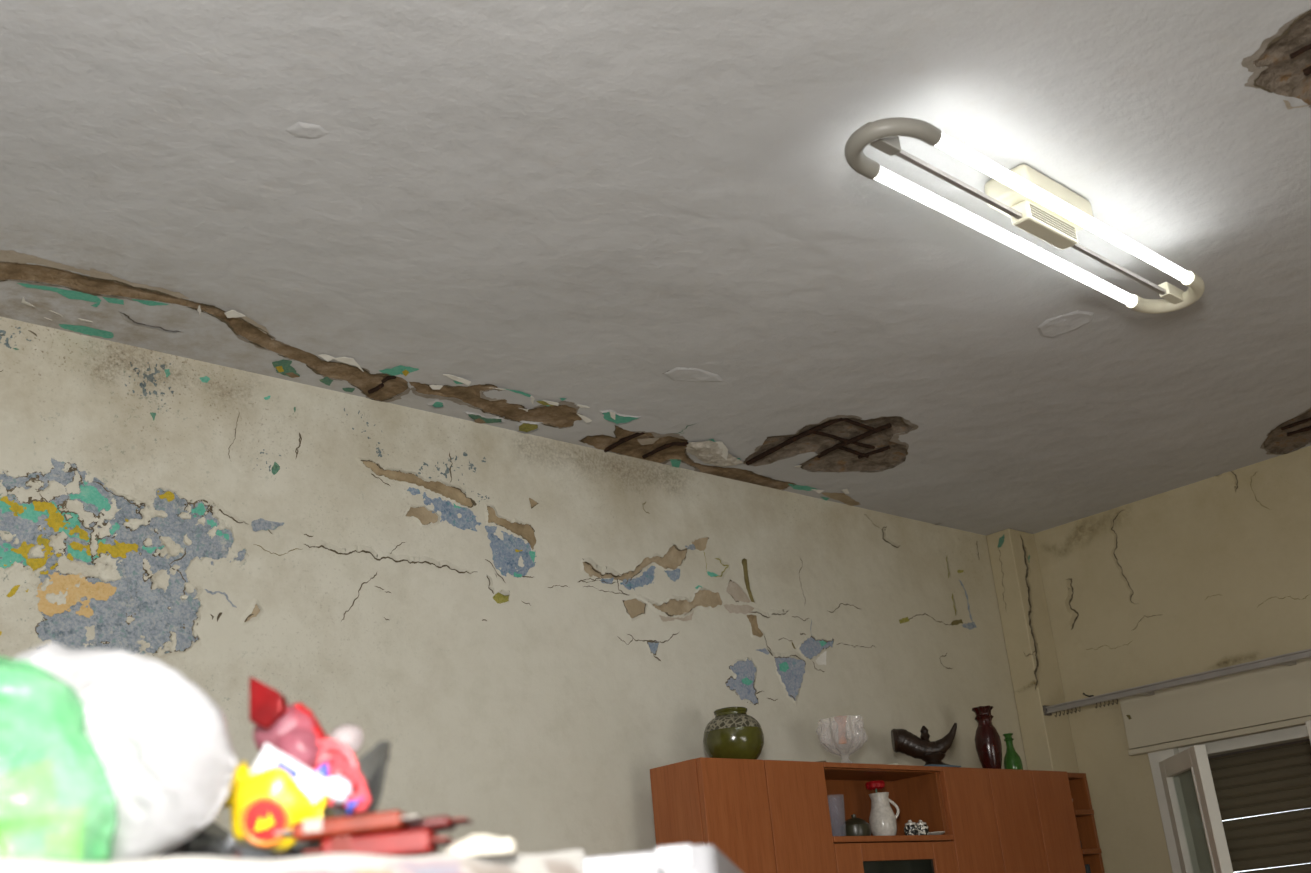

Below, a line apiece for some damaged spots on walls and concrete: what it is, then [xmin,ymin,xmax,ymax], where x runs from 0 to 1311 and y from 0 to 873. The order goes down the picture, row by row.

spalling [1241,9,1311,110]
flaking render [0,250,919,605]
spalling [1260,408,1311,455]
peeling [0,457,284,659]
crack [253,534,477,621]
peeling [578,537,834,705]
crack [976,535,1041,690]
crack [1065,509,1156,650]